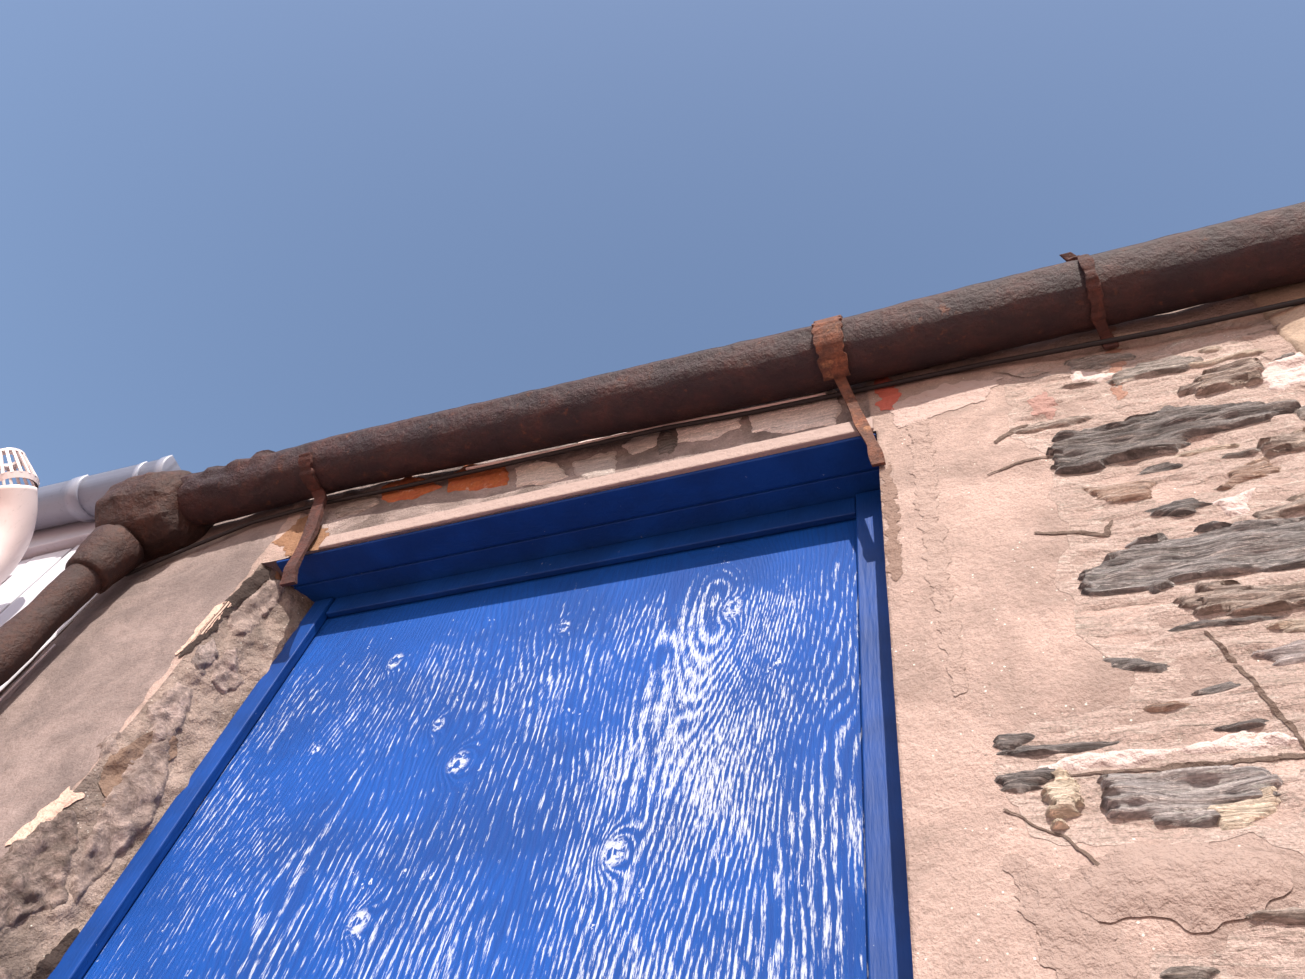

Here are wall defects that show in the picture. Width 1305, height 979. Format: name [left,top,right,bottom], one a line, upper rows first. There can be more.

rust [874,377,902,410]
rust [1105,326,1128,400]
rust [272,515,330,556]
spalling [984,309,1305,856]
crack [1068,631,1305,776]
spalling [1149,900,1305,979]